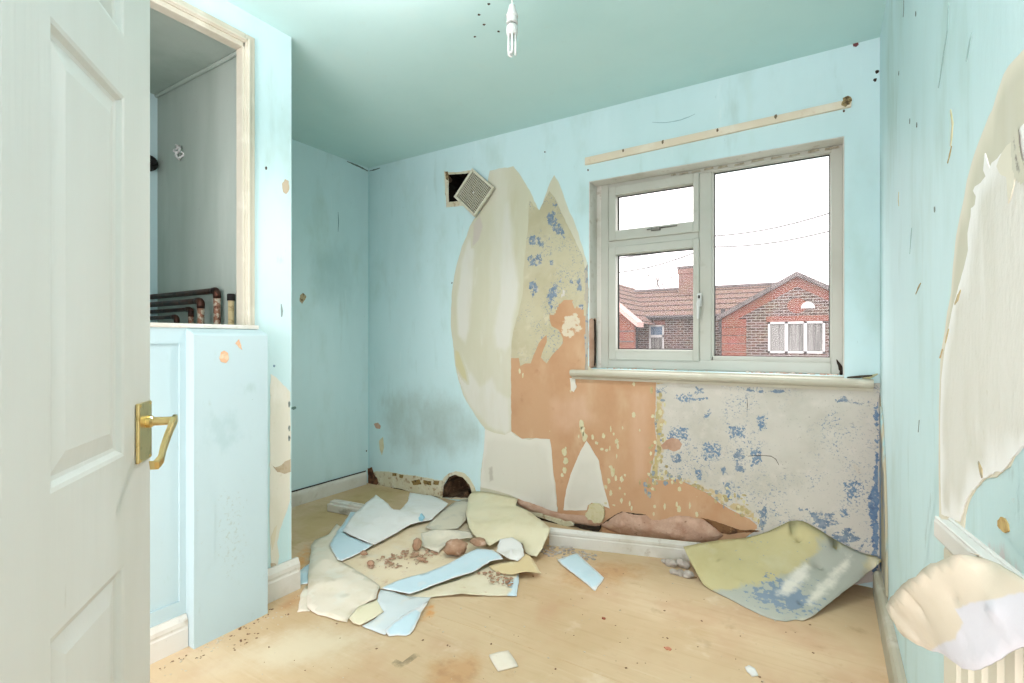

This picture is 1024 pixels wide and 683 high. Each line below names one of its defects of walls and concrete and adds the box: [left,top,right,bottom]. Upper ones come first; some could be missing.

spalling [444,170,471,207]
peeling [219,340,242,363]
flaking render [511,191,888,599]
peeling [269,365,296,567]
peeling [368,467,476,500]